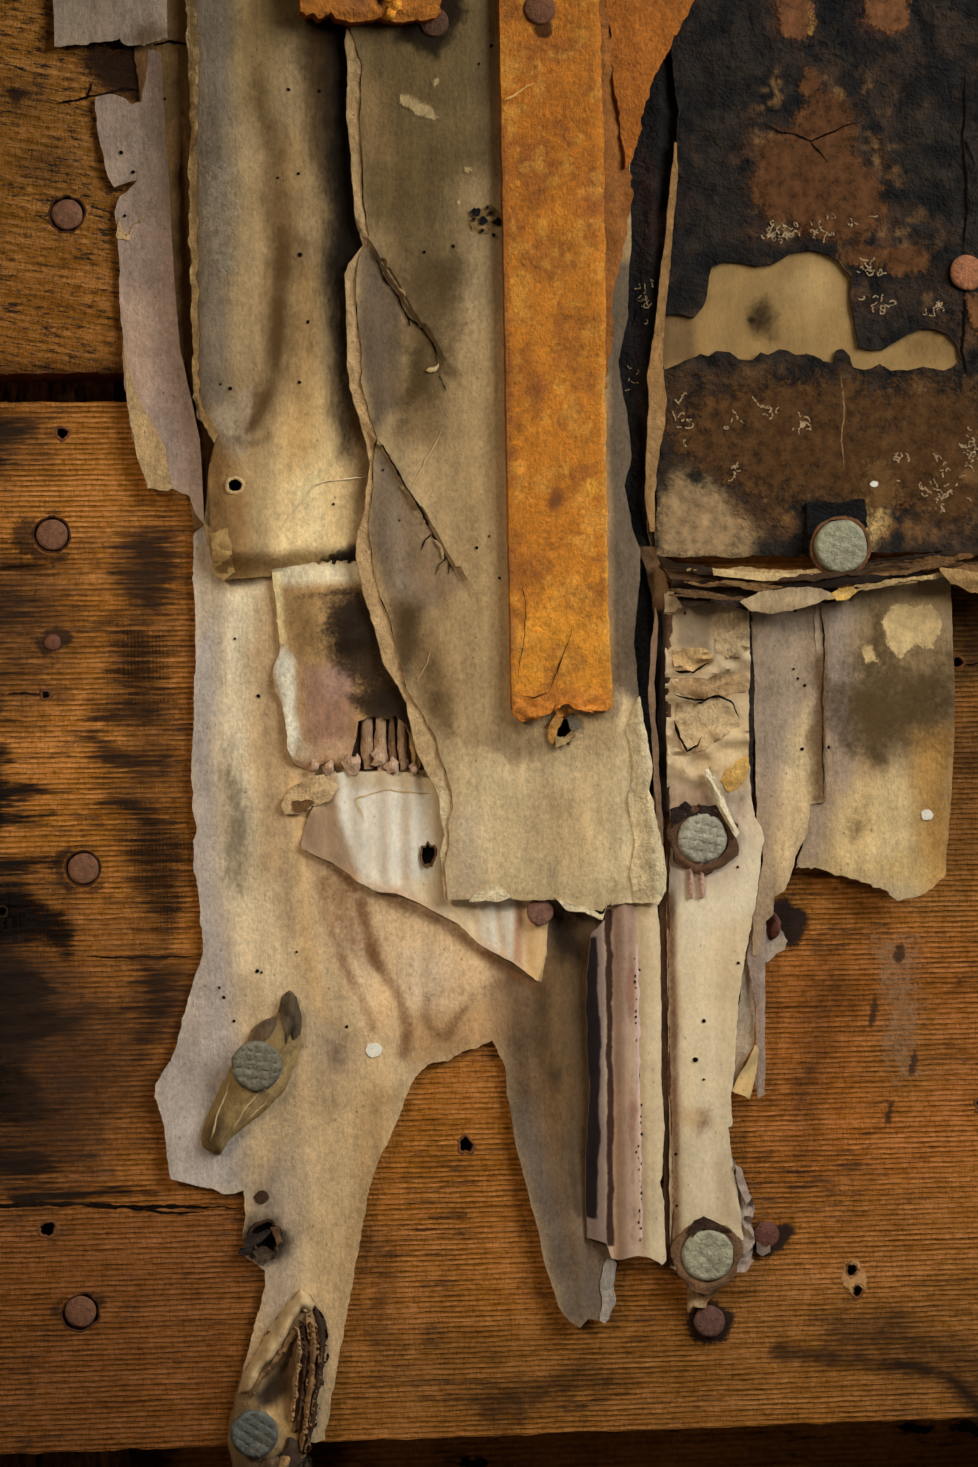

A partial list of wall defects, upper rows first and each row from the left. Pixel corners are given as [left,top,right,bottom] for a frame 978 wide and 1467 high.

corrosion [535,21,552,38]